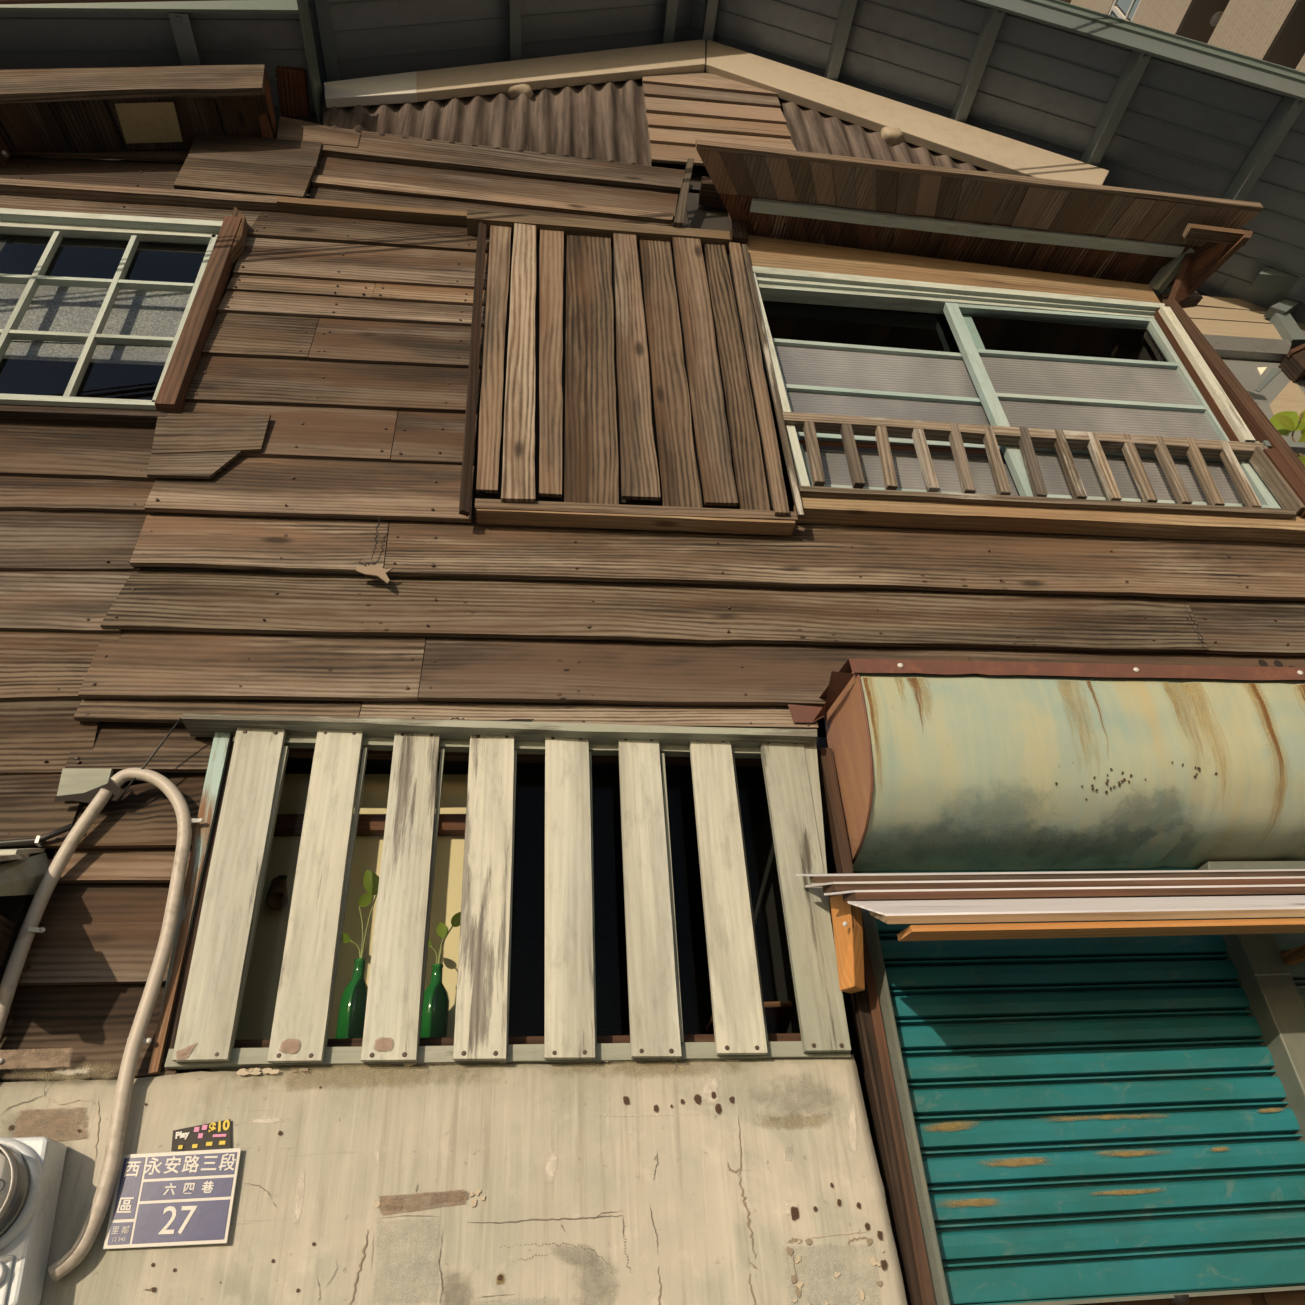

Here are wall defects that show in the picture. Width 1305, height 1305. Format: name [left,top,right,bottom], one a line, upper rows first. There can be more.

rust [863,678,877,739]
rust [907,678,922,721]
rust [1250,683,1283,782]
rust [930,1122,967,1131]
rust [990,1158,1045,1166]
crack [469,1156,662,1305]
crack [727,1116,757,1305]
rust [950,1198,994,1206]
flaking render [787,1231,884,1305]